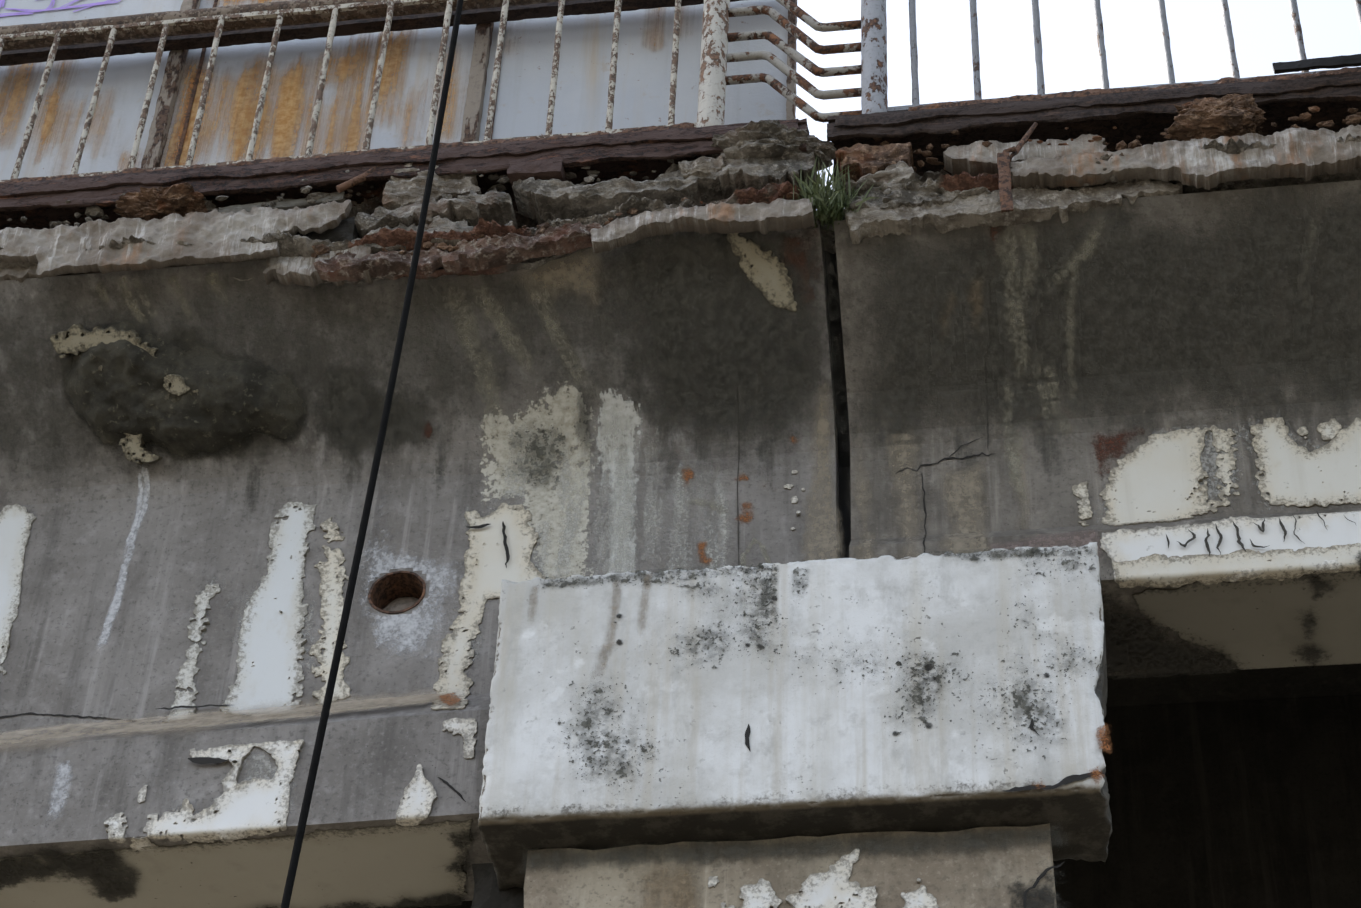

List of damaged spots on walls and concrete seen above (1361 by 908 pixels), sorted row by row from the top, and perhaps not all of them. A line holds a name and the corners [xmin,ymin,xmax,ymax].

spalling [50,120,1361,284]
leakage [100,470,150,643]
peeling [220,502,351,716]
peeling [431,381,643,759]
leakage [170,232,1236,758]
crack [896,361,991,553]
peeling [1072,417,1361,670]
crack [1166,511,1356,556]
leakage [0,693,448,745]
mould [549,681,660,792]
peeling [0,739,473,908]
peeling [720,849,879,908]